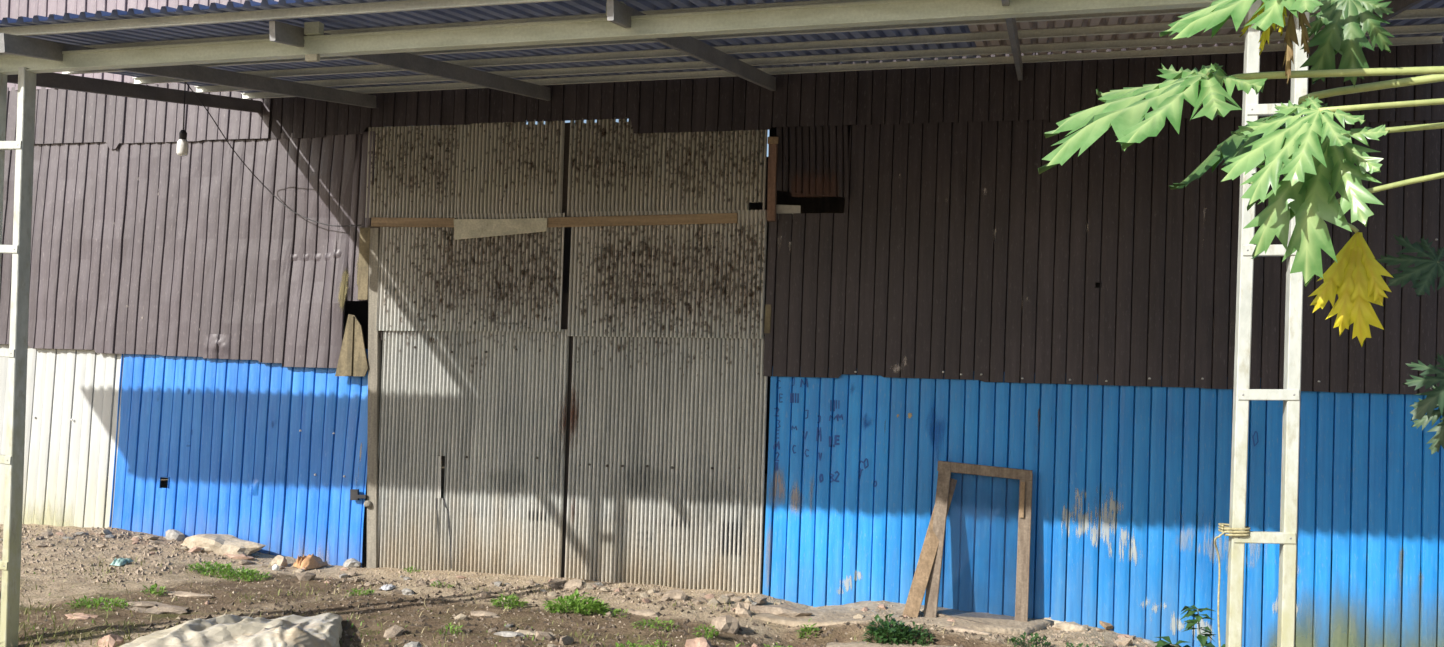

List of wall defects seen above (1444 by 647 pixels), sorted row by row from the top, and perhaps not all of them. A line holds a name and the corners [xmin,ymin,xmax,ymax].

peeling [1061,489,1137,563]